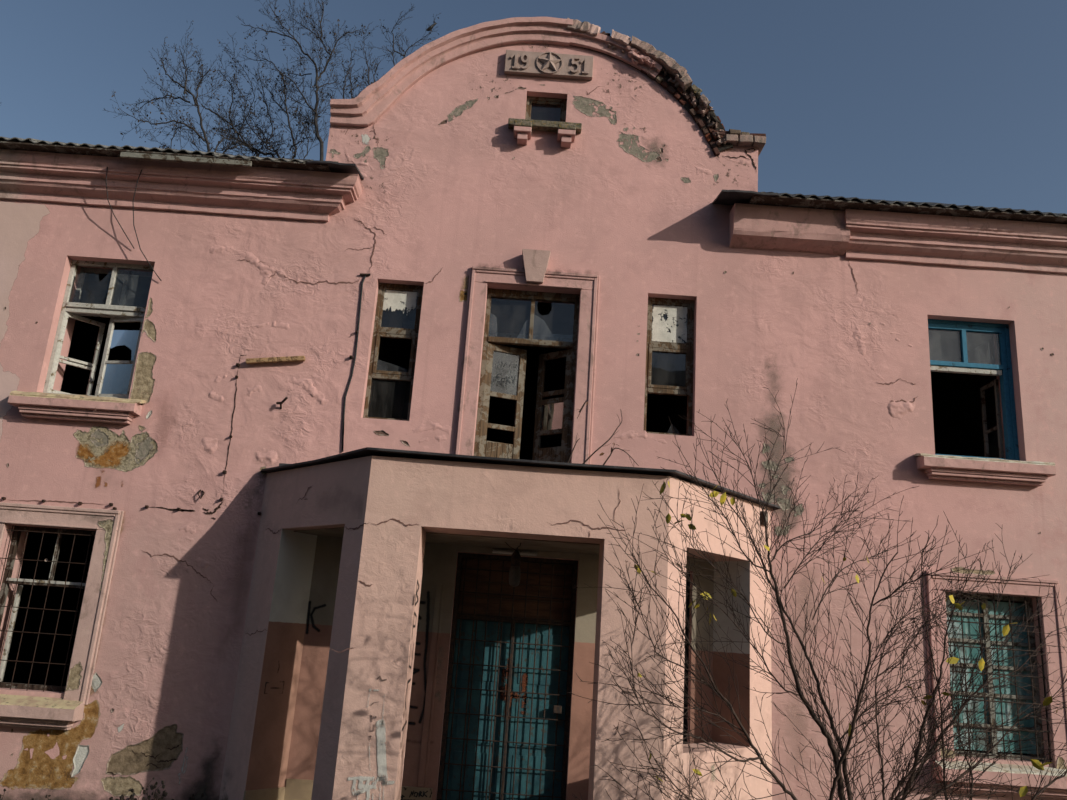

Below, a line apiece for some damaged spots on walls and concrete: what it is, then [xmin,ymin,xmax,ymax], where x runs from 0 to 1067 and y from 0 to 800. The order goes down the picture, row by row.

peeling [439,74,526,125]
flaking render [573,46,766,184]
crack [237,217,387,285]
peeling [73,298,158,488]
leakage [758,419,804,536]
crack [346,518,419,530]
crack [144,551,217,601]
peeling [0,672,114,790]
spalling [101,724,184,797]